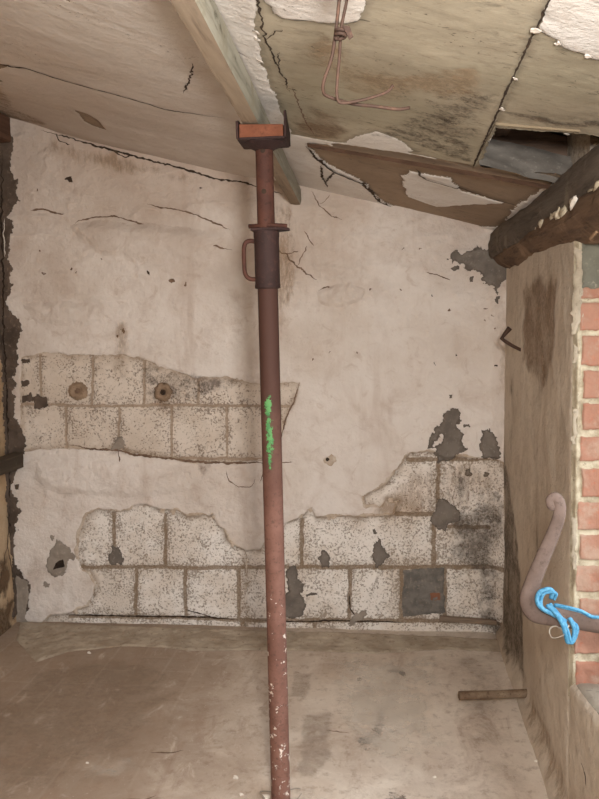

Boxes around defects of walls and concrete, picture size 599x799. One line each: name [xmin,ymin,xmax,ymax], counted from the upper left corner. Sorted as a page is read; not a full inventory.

peeling [75,110,106,130]
crack [43,130,256,187]
peeling [252,0,599,227]
crack [279,231,316,280]
spalling [19,352,262,464]
spalling [280,382,300,432]
leakage [0,559,13,636]
peeling [5,473,17,621]
spalling [43,504,267,628]
spalling [284,449,505,634]